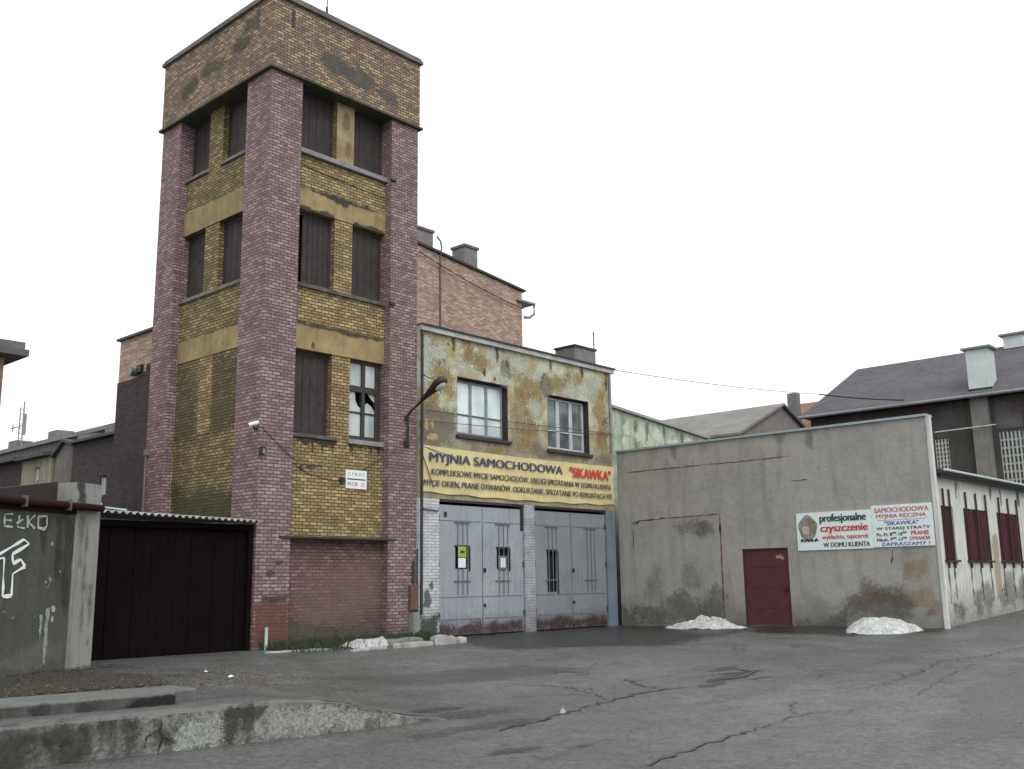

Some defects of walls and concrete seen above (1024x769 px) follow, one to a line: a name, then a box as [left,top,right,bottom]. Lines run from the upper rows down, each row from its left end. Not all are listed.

peeling [417,334,610,457]
corrosion [440,620,523,636]
corrosion [536,615,607,630]
crack [492,664,685,762]
crack [635,647,1018,767]